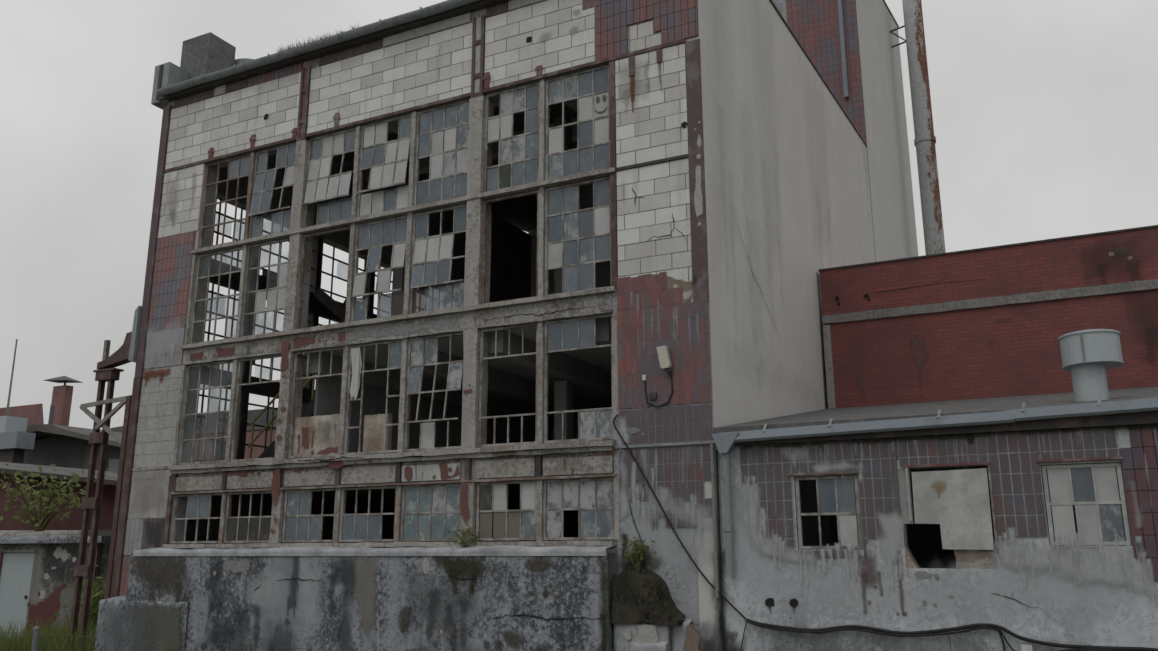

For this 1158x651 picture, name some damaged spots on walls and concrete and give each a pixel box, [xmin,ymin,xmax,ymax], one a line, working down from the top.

damp [526,556,550,571]
spalling [956,550,991,563]
damp [201,557,298,651]
damp [330,558,376,651]
damp [399,571,476,651]
damp [484,631,524,649]